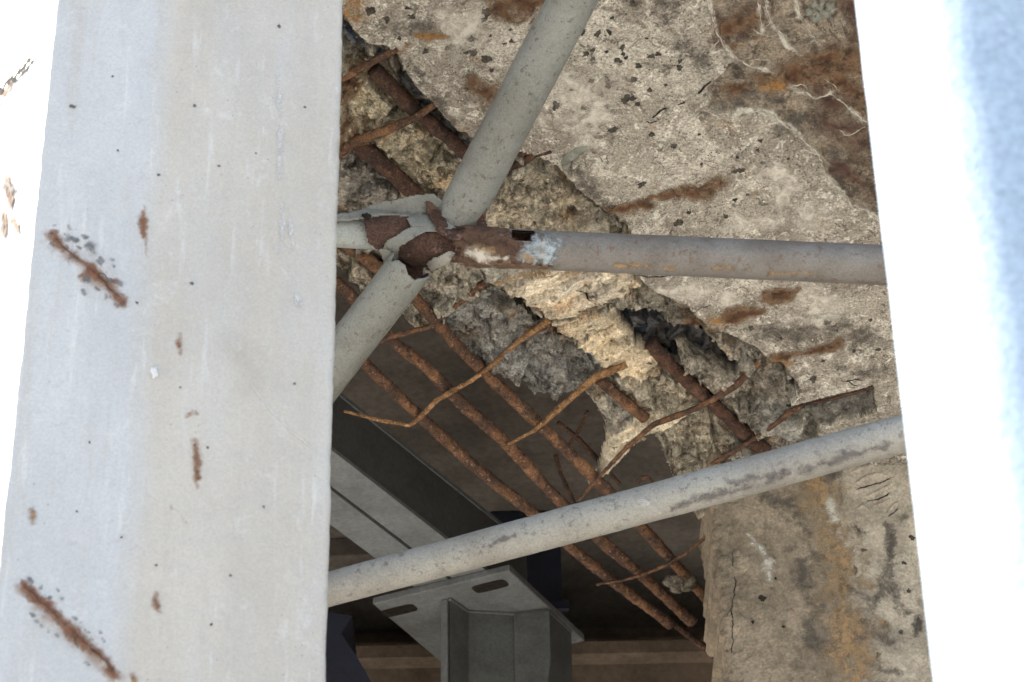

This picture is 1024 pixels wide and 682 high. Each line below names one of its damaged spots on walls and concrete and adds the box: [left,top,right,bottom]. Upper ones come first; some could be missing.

hole [581,16,667,107]
crack [705,0,868,136]
spalling [337,18,473,220]
peeling [706,0,881,220]
rust [139,211,147,238]
spalling [336,212,455,294]
spalling [485,155,631,234]
rust [603,178,728,216]
rust [524,322,565,342]
spalling [402,251,877,485]
rust [768,337,845,366]
crack [856,477,899,516]